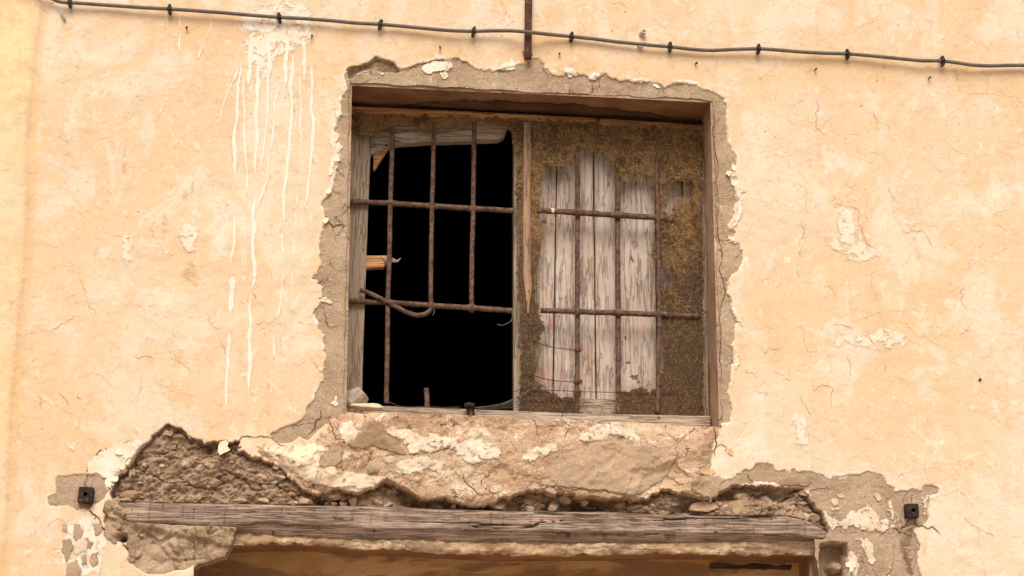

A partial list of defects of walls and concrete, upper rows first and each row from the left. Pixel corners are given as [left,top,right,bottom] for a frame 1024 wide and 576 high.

peeling [179,223,199,253]
water stain [220,0,315,403]
spalling [271,57,746,443]
peeling [833,207,880,263]
peeling [833,326,915,350]
spalling [48,439,236,576]
crack [530,485,622,495]
spalling [718,463,938,576]